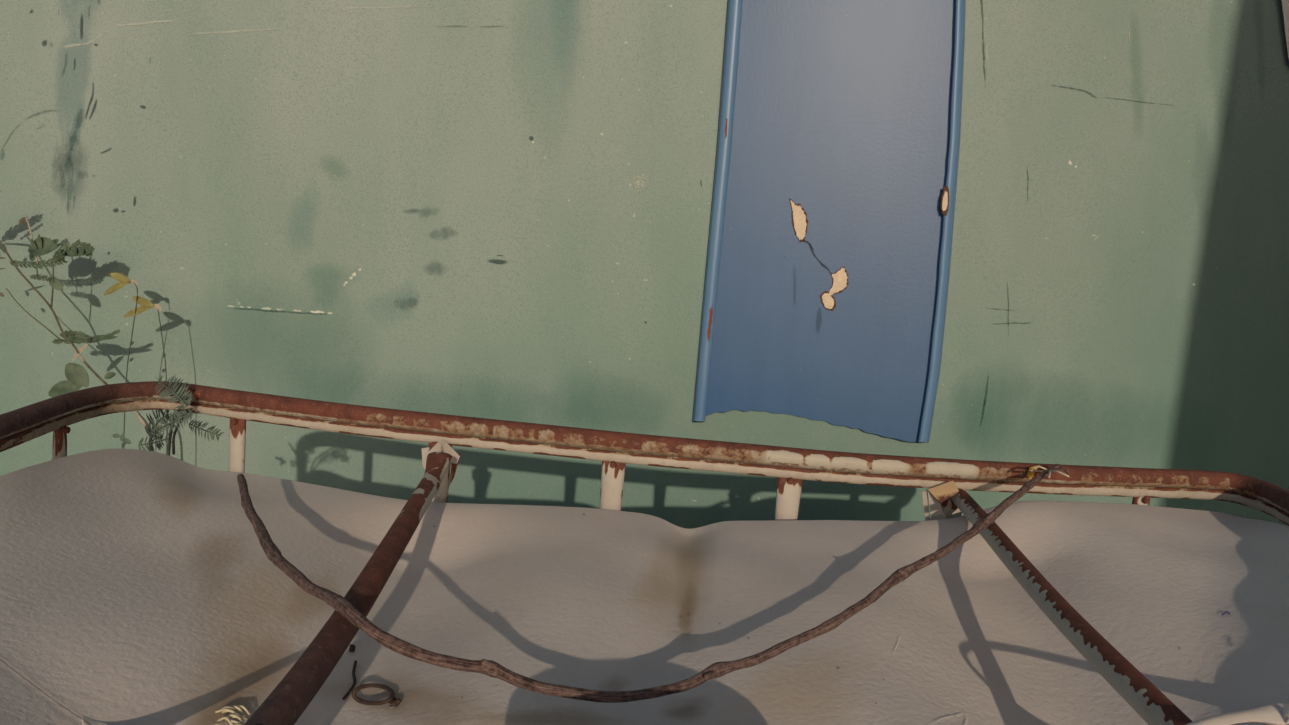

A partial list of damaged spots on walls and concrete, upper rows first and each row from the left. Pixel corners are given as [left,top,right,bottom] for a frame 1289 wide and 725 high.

peeling [790,199,809,242]
peeling [941,186,949,216]
peeling [820,266,849,311]